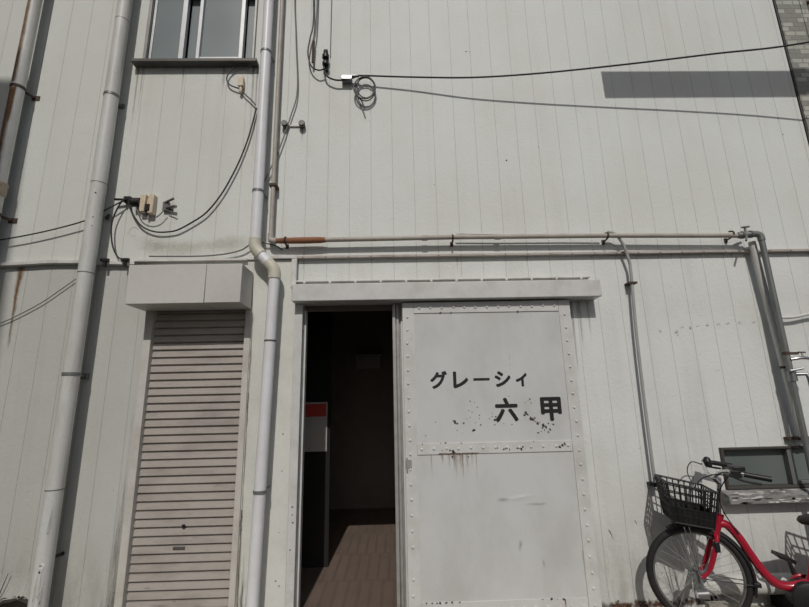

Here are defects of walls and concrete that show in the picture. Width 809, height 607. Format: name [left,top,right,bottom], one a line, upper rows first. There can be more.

corrosion [0,0,30,151]